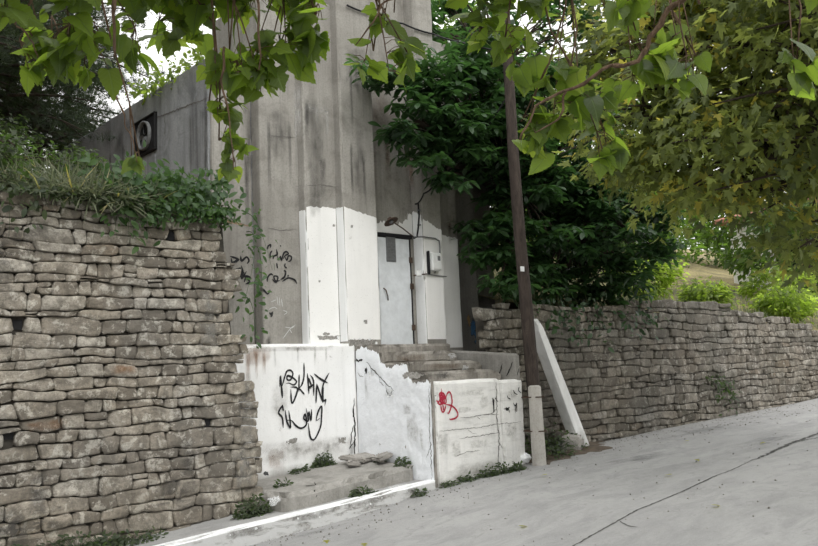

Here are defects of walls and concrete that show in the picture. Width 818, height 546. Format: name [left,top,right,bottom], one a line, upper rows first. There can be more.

crack [355,359,394,396]
crack [348,403,356,454]
crack [426,363,519,479]